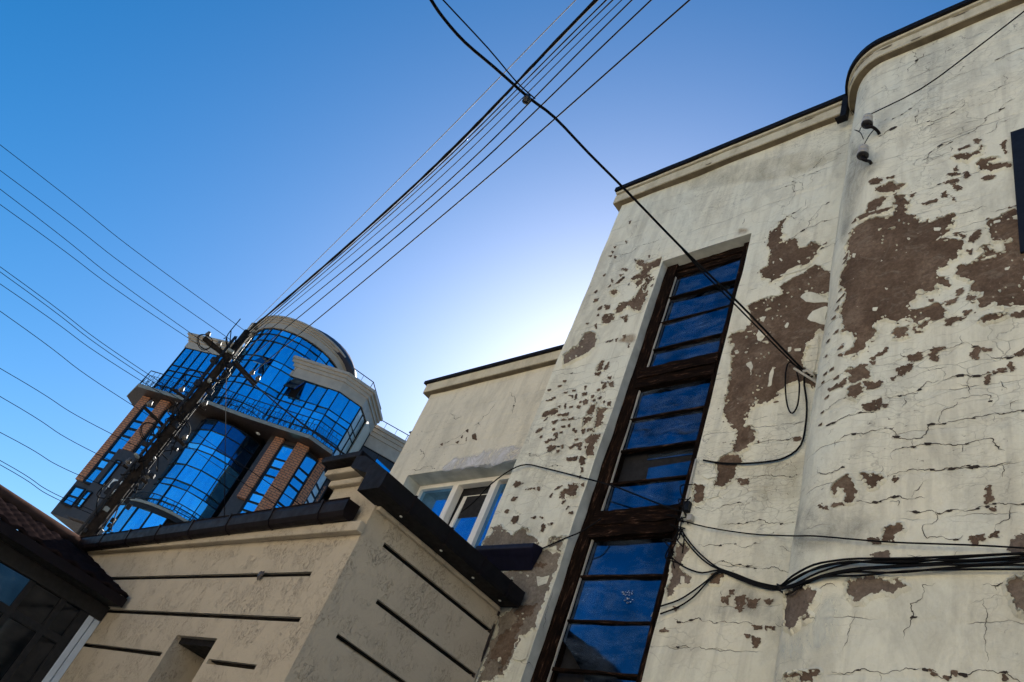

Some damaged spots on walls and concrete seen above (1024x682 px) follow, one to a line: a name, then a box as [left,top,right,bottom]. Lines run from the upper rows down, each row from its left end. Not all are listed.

crack [879,48,1023,160]
peeling [691,138,1024,512]
peeling [476,241,664,682]
crack [755,339,1024,557]
crack [672,616,783,651]
spalling [665,541,823,648]
crack [698,502,796,573]
spalling [842,573,913,607]
crack [833,583,1020,682]
spalling [1001,573,1024,621]